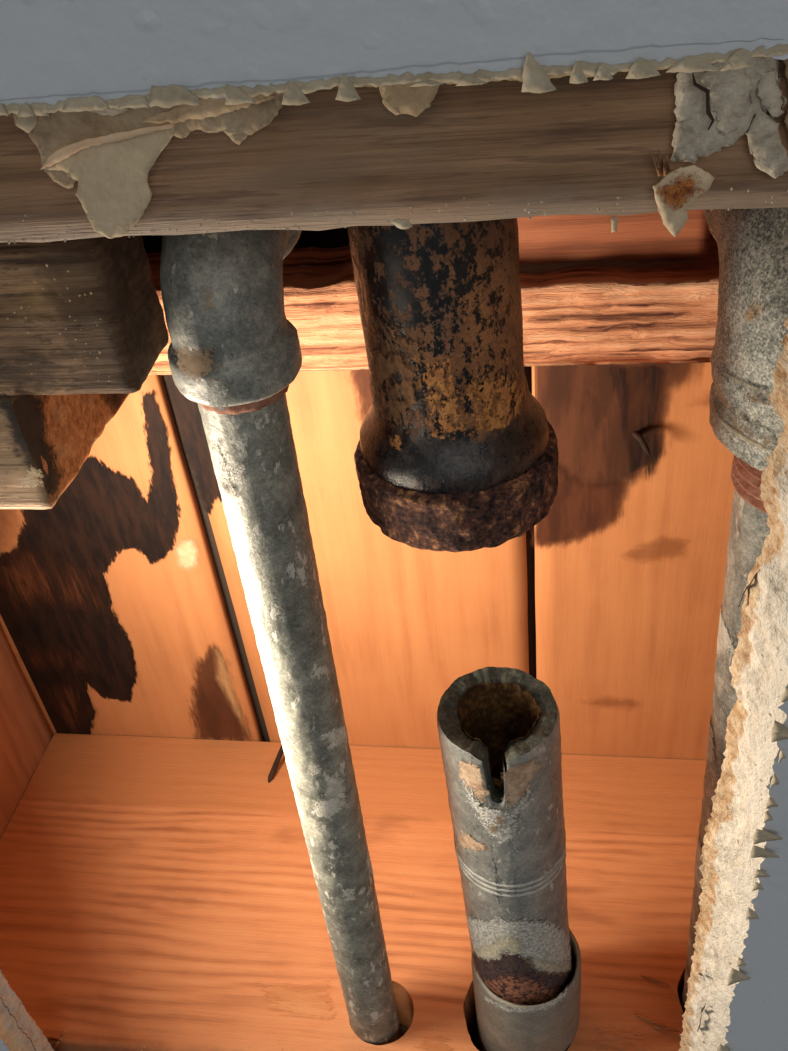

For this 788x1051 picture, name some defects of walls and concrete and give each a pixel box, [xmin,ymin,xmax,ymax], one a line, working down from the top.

crack [692,73,715,130]
spalling [671,56,788,179]
corrosion [656,171,705,212]
damp [351,370,372,420]
peeling [210,440,250,504]
damp [532,363,689,546]
damp [0,343,222,735]
damp [192,647,249,741]
spalling [679,317,788,1051]
peeling [309,763,347,821]
peeling [458,757,542,808]
spalling [0,969,54,1051]